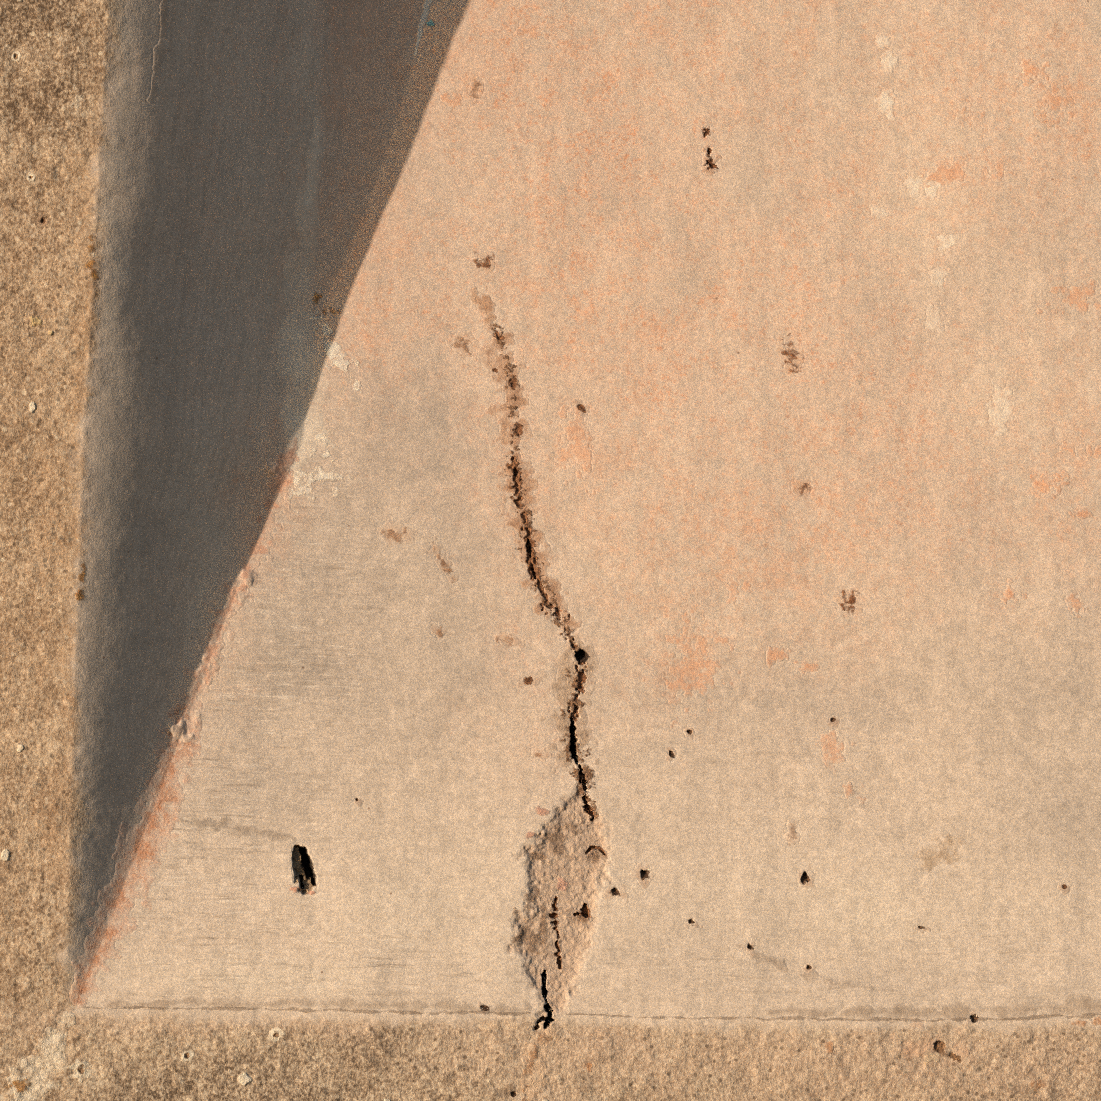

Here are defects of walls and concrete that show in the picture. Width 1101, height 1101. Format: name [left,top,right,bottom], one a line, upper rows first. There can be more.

rust [69,437,300,1009]
spalling [299,847,316,889]
crack [467,285,606,855]